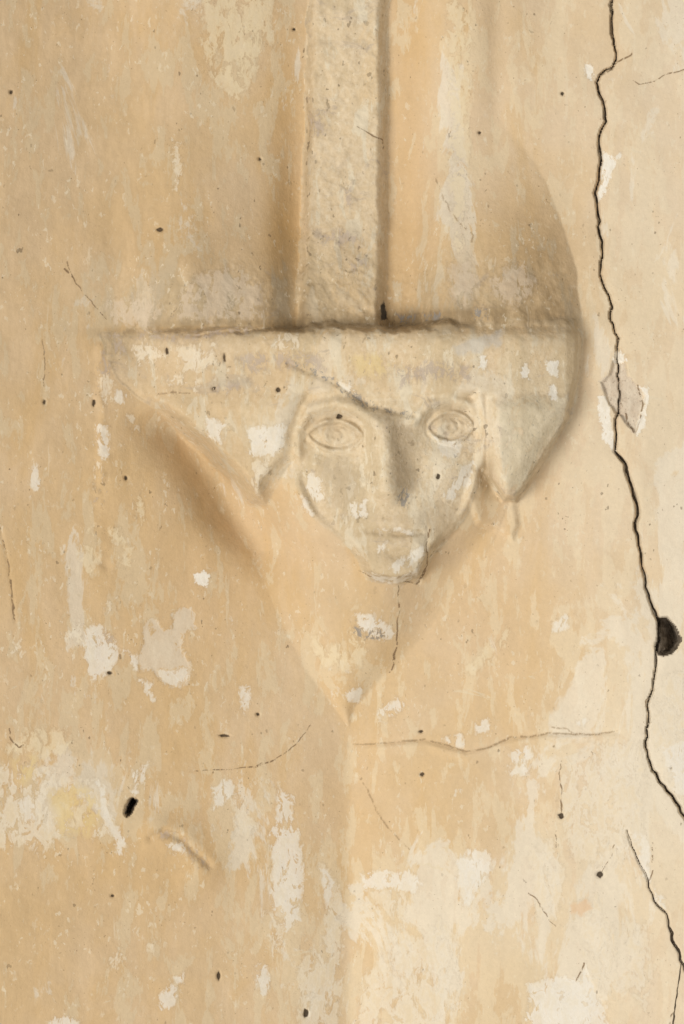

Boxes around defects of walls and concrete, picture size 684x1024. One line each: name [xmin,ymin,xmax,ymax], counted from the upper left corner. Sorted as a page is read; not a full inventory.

peeling [202,415,227,446]
peeling [245,419,290,503]
spalling [597,349,650,460]
crack [594,0,684,817]
peeling [59,595,199,703]
crack [389,529,430,673]
peeling [210,777,466,1024]
crack [606,831,684,1024]